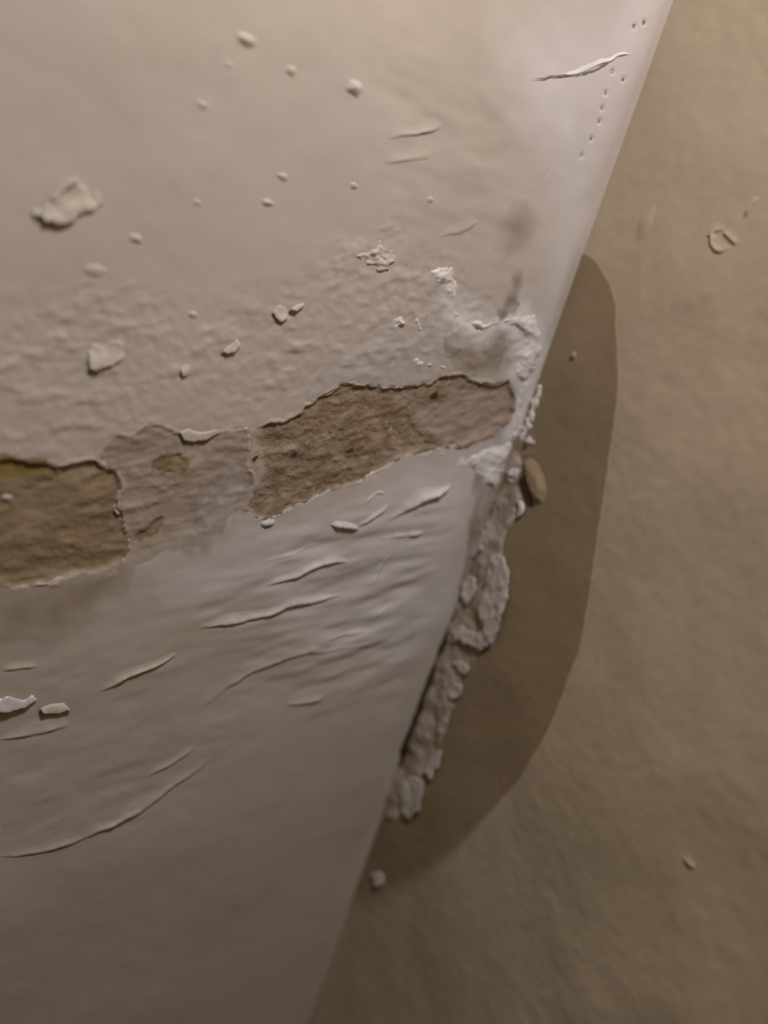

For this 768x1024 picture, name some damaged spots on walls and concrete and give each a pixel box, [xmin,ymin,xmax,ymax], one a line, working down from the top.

peeling [32,178,104,225]
spalling [0,371,525,821]
damp [0,251,621,917]